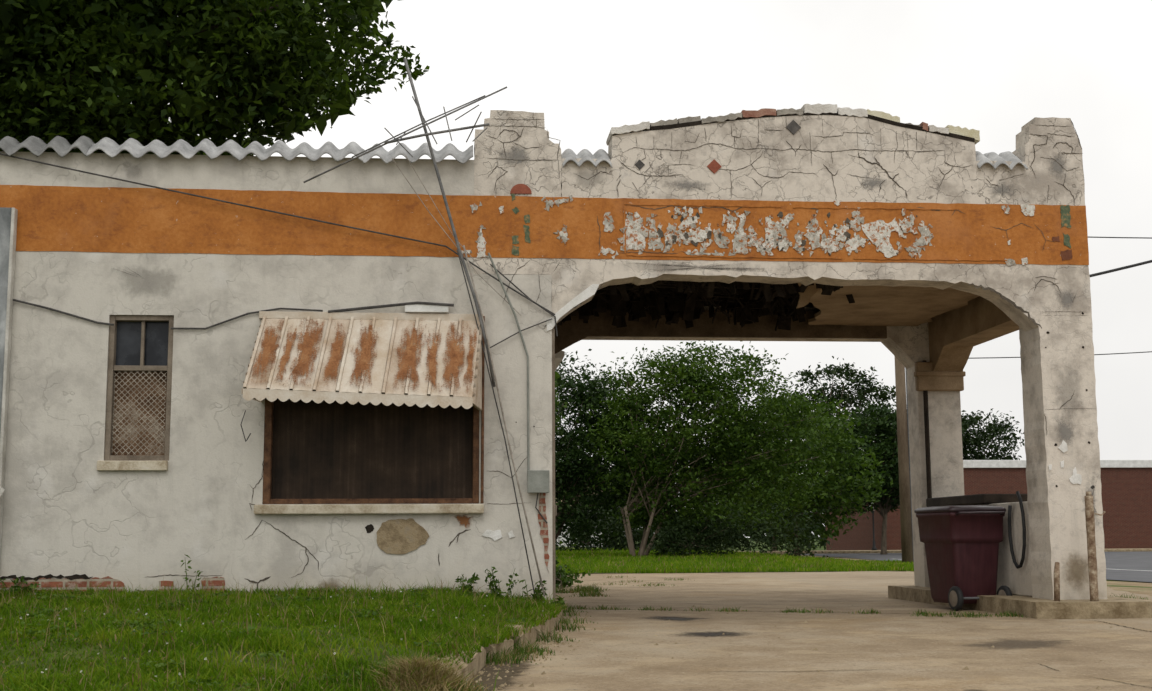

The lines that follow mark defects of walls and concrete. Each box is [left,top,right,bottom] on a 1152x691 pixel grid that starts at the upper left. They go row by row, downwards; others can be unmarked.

peeling [456,225,489,258]
peeling [499,193,531,256]
peeling [541,195,573,211]
peeling [554,224,569,246]
peeling [598,200,934,259]
rust [252,319,377,386]
peeling [1048,440,1082,485]
crack [138,460,319,592]
flaking render [376,518,429,554]
flaking render [538,493,549,567]
flaking render [0,576,125,593]